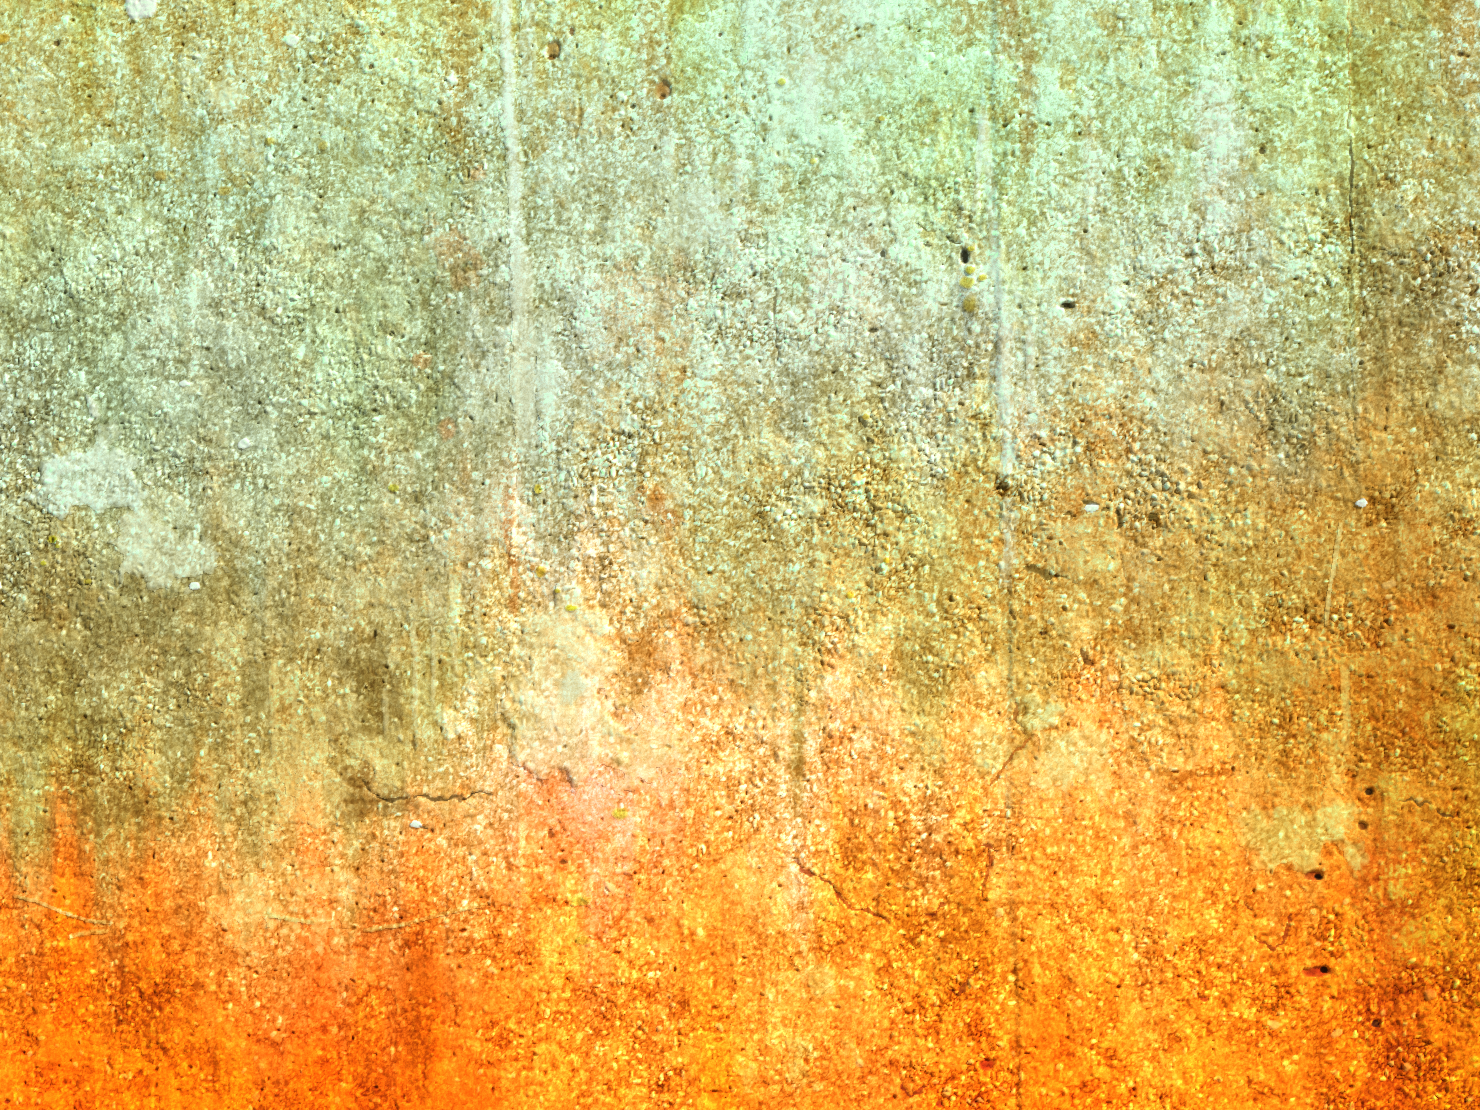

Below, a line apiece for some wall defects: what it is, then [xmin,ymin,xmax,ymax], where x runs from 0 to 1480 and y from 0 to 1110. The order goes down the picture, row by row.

water stain [0,0,486,863]
water stain [491,0,565,503]
crack [362,780,493,829]